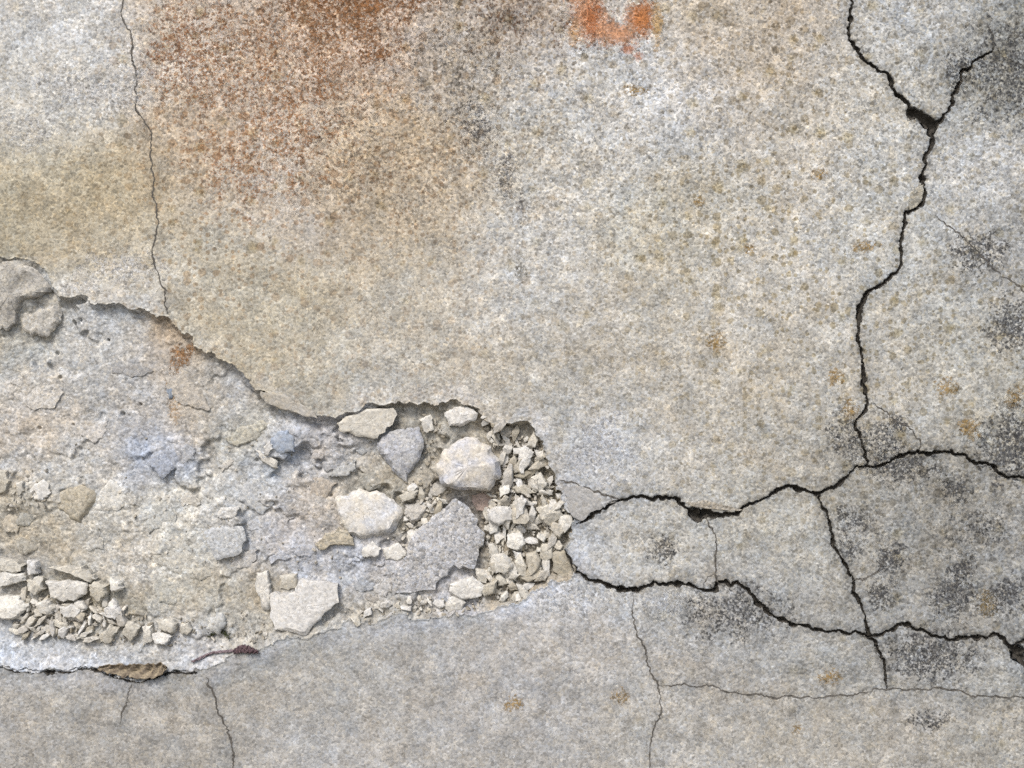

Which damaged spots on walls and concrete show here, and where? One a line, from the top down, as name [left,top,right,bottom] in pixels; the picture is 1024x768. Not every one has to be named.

crack [120,0,168,314]
rust [140,0,441,201]
rust [459,0,535,41]
rust [551,0,663,59]
spalling [0,257,616,683]
crack [561,0,1024,768]